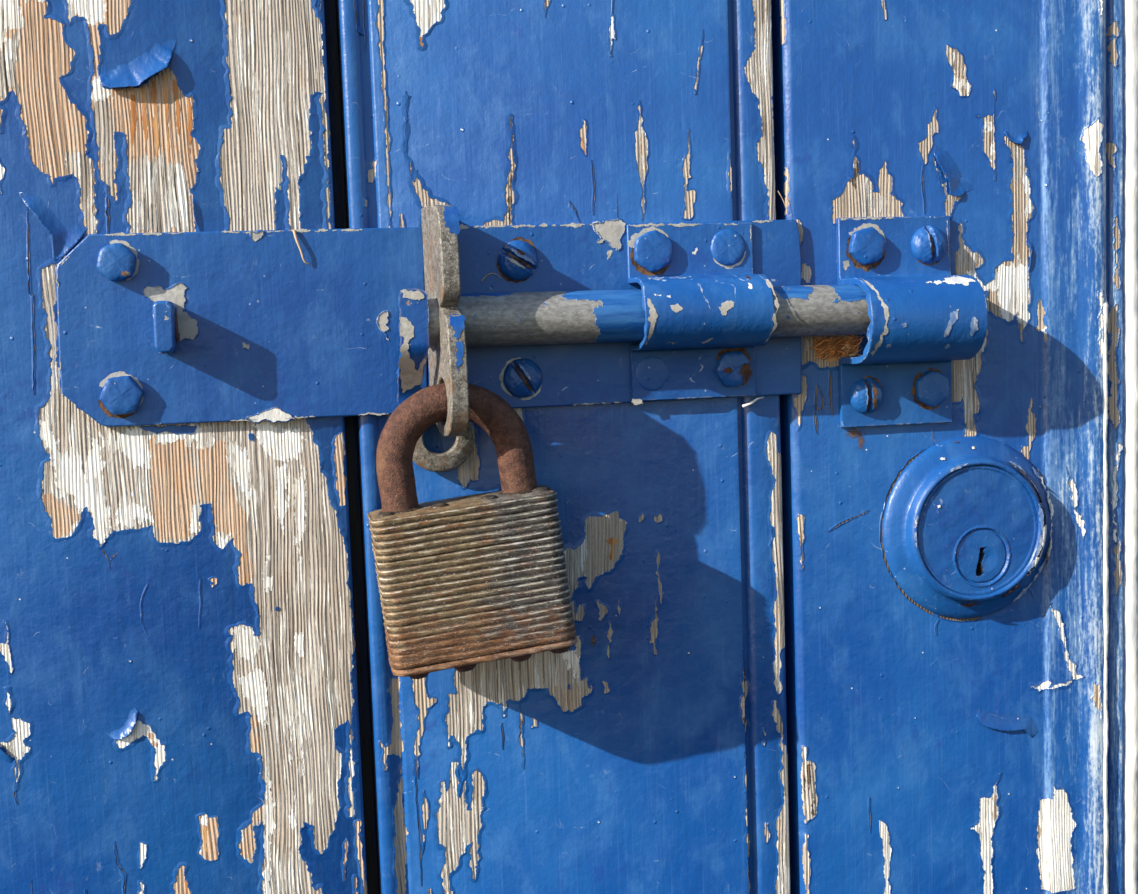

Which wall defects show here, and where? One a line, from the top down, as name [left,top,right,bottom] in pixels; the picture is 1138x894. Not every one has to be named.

peeling [0,0,368,894]
peeling [362,0,459,228]
corrosion [724,363,752,385]
peeling [742,0,815,285]
peeling [791,278,891,431]
peeling [828,135,907,237]
peeling [916,88,1049,449]
peeling [378,509,665,894]
peeling [968,772,1003,894]
peeling [1033,784,1080,894]